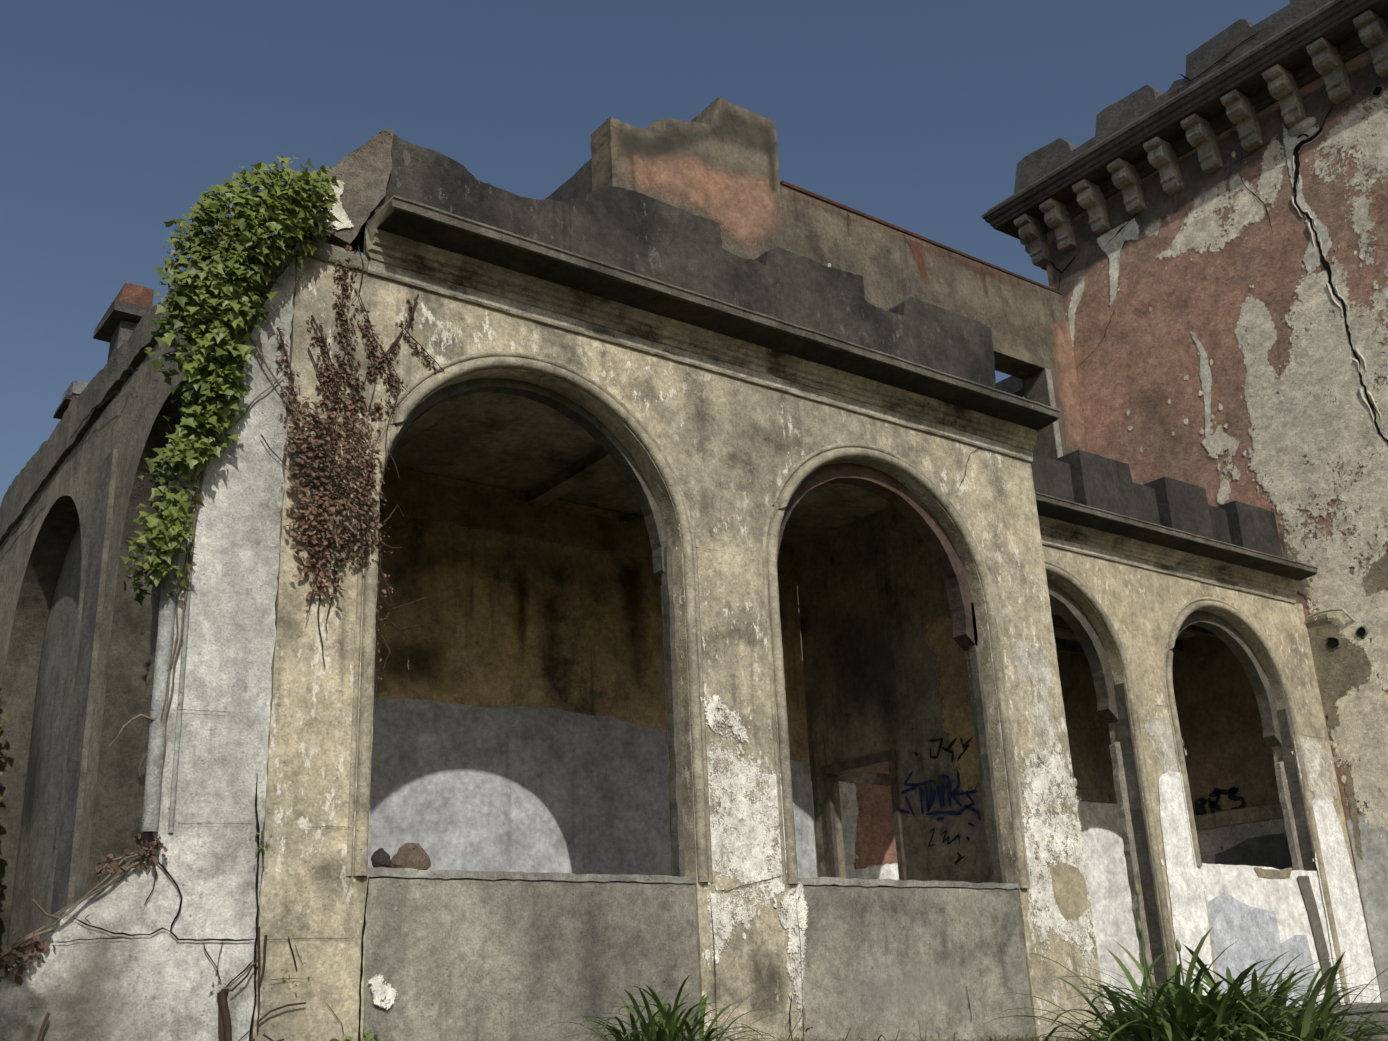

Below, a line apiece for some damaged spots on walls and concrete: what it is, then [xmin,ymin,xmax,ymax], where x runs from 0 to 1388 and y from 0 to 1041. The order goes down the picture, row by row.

peeling [1055,275,1087,445]
crack [1230,104,1388,443]
peeling [1097,85,1388,1005]
crack [58,779,370,1041]
peeling [368,972,398,1010]
peeling [700,694,809,1009]
peeling [1008,629,1098,972]